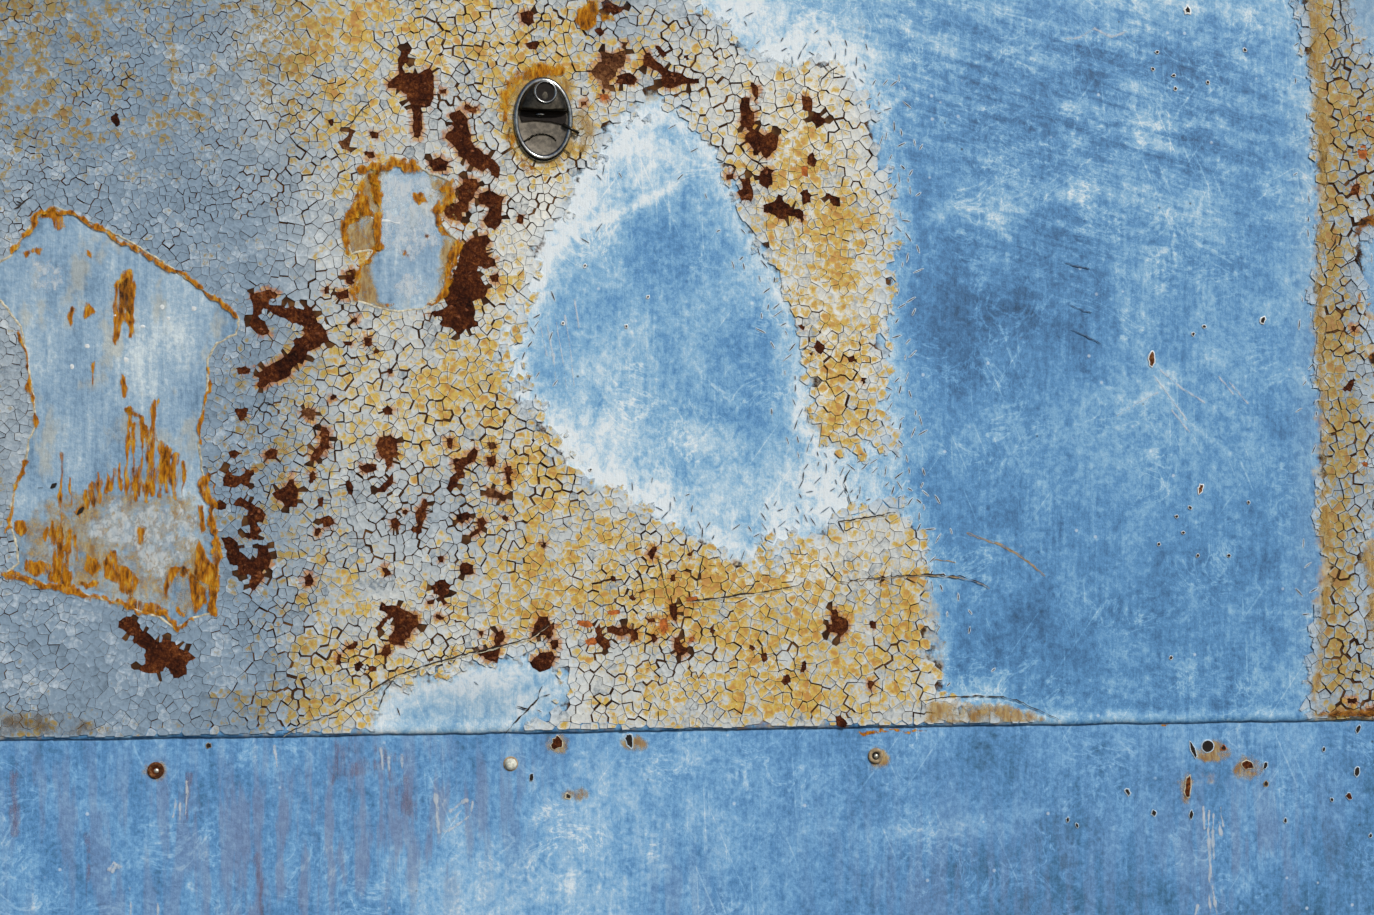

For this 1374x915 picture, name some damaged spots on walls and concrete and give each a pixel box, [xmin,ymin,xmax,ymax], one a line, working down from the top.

peeling [340,156,467,340]
rust [387,49,446,139]
rust [428,103,524,336]
rust [499,0,699,174]
rust [726,83,840,223]
peeling [0,206,240,632]
rust [217,448,278,591]
rust [236,290,379,389]
rust [446,438,513,538]
crack [0,0,1059,737]
crack [1289,0,1374,719]
rust [337,562,475,672]